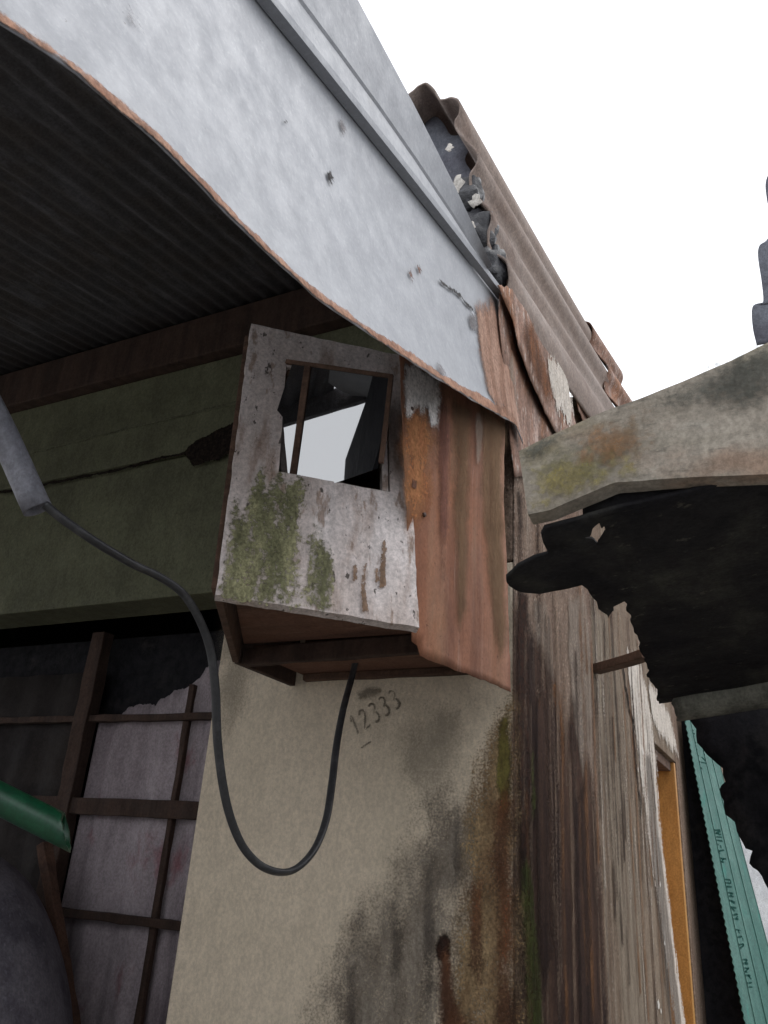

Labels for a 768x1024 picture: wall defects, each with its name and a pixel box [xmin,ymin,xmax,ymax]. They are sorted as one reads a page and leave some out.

crack [43,451,185,486]
spalling [185,422,233,467]
corrosion [0,11,524,619]
corrosion [523,322,554,403]
leakage [307,789,481,1024]
corrosion [439,690,526,1024]
peeling [628,664,686,1024]